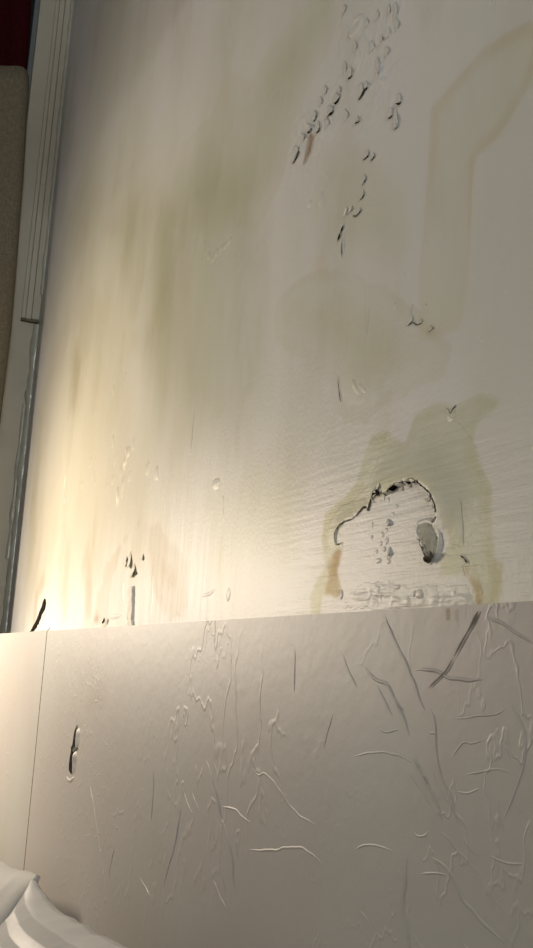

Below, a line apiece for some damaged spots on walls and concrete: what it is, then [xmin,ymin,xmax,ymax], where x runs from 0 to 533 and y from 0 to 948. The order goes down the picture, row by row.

peeling [282,0,410,203]
spalling [415,517,443,565]